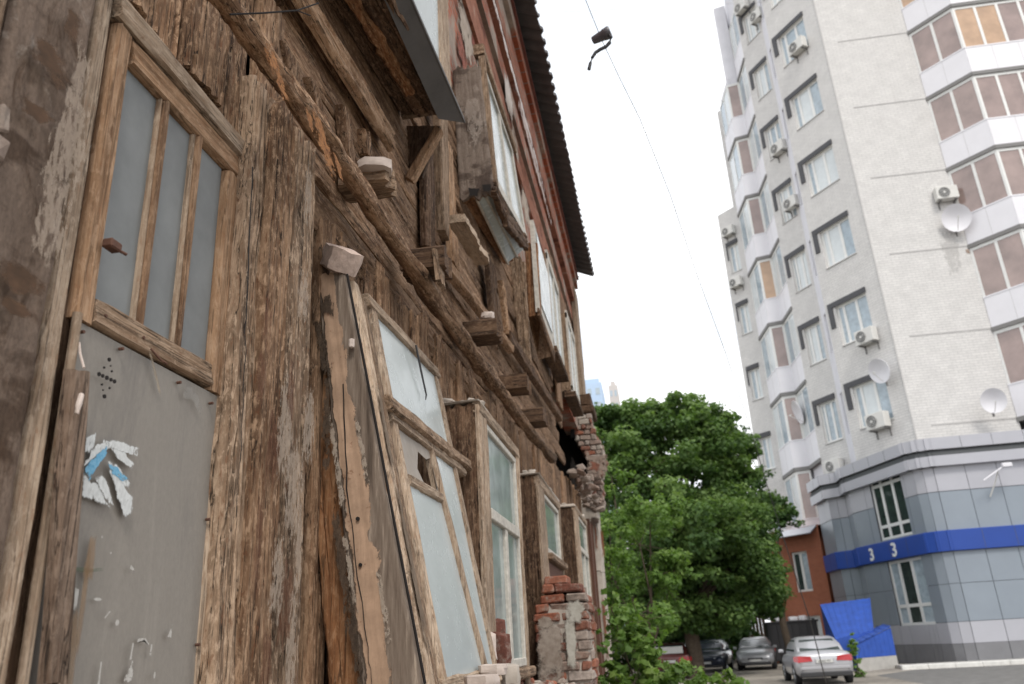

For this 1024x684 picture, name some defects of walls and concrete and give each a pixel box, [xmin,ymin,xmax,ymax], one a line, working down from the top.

peeling [0,8,91,318]
peeling [304,159,312,230]
peeling [268,270,363,684]
spalling [575,413,609,527]
peeling [567,600,585,623]